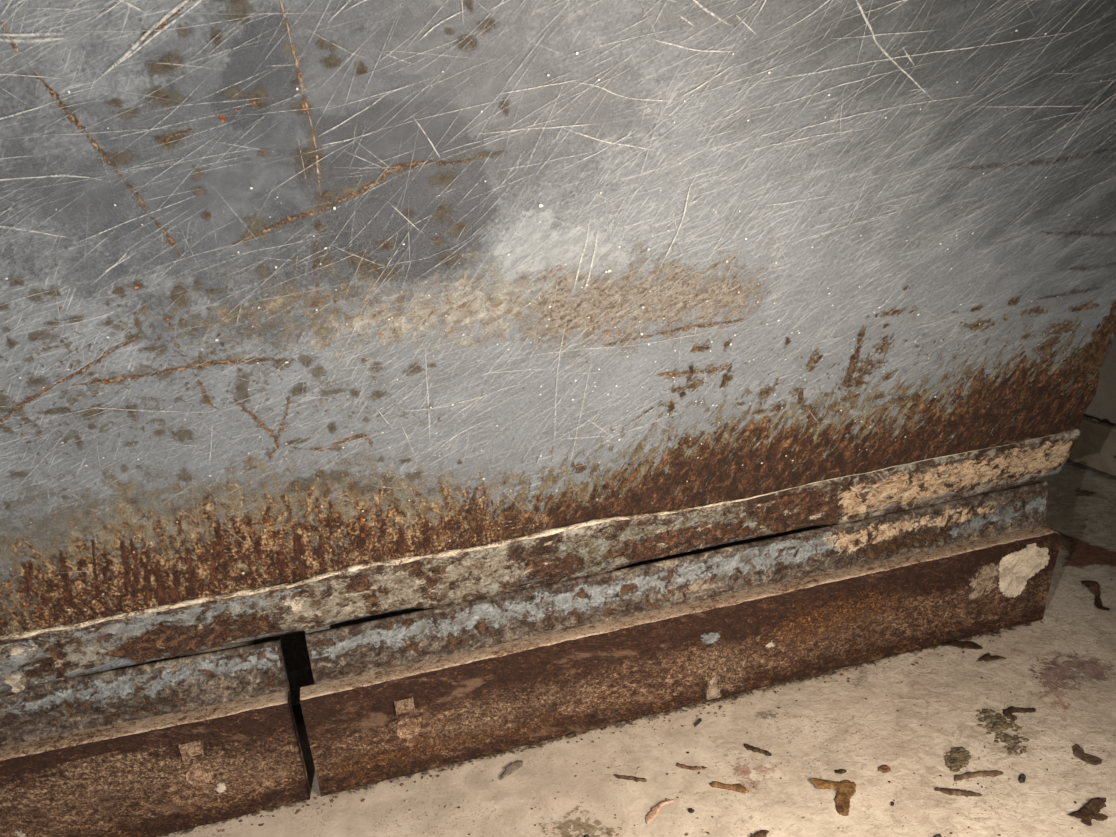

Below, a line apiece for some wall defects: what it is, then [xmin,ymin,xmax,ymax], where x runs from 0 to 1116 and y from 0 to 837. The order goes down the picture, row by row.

rust [107,99,139,119]
peeling [0,440,1073,715]
rust [0,248,1116,743]
rust [0,743,292,820]